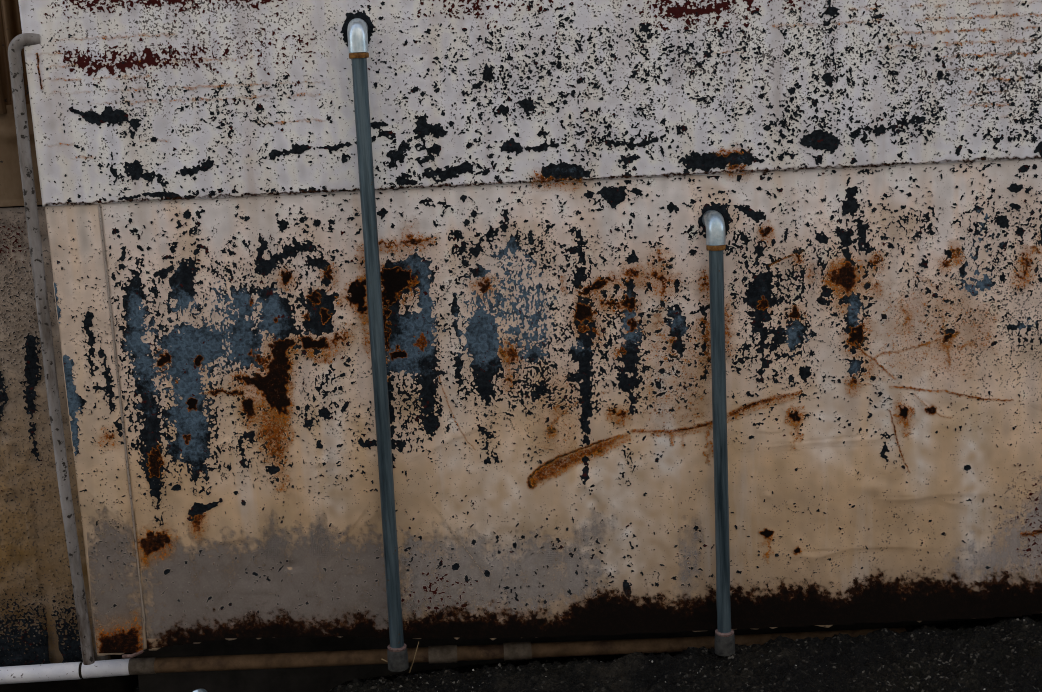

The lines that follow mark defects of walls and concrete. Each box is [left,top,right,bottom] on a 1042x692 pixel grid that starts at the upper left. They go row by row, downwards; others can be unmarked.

peeling [41,0,383,84]
peeling [631,0,772,43]
peeling [67,101,226,208]
corrosion [375,148,1042,191]
peeling [463,52,1042,409]
peeling [53,212,377,535]
corrosion [185,244,370,491]
peeling [371,110,711,496]
corrosion [560,249,711,428]
corrosion [96,608,390,653]
corrosion [402,585,717,639]
corrosion [730,568,1042,629]